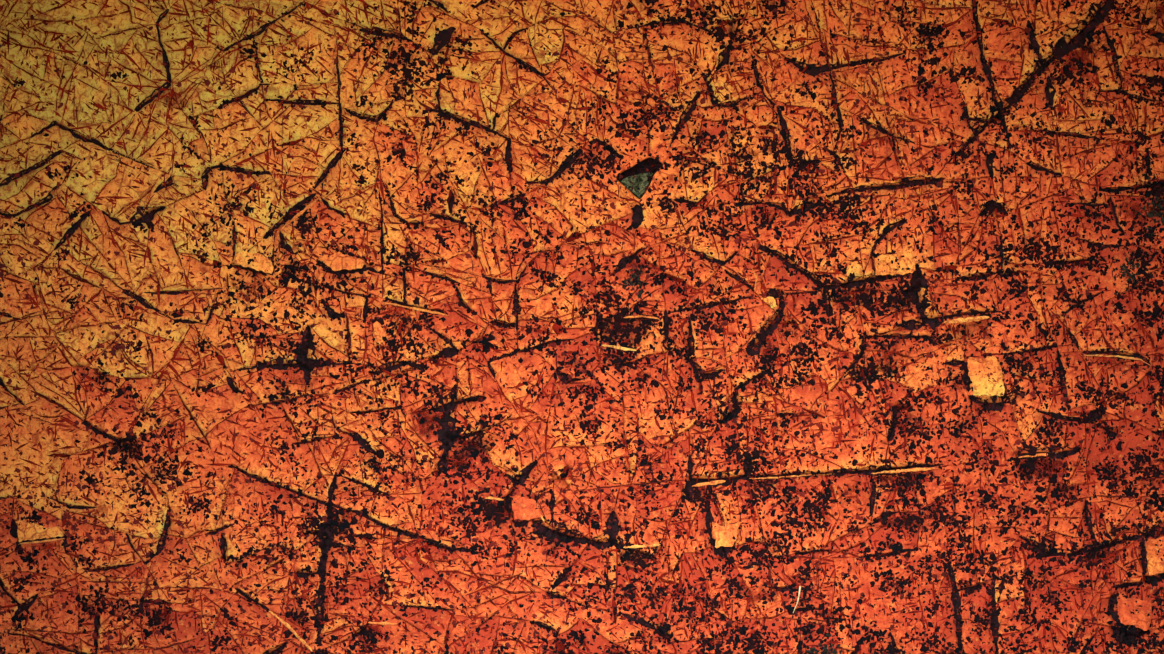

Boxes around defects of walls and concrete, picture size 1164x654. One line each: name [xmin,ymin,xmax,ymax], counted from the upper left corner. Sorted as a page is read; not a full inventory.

peeling [944,316,993,342]
peeling [967,356,1005,396]
crack [1016,576,1032,609]
crack [348,643,391,654]
crack [414,636,430,654]
crack [868,602,901,654]
crack [901,626,926,646]